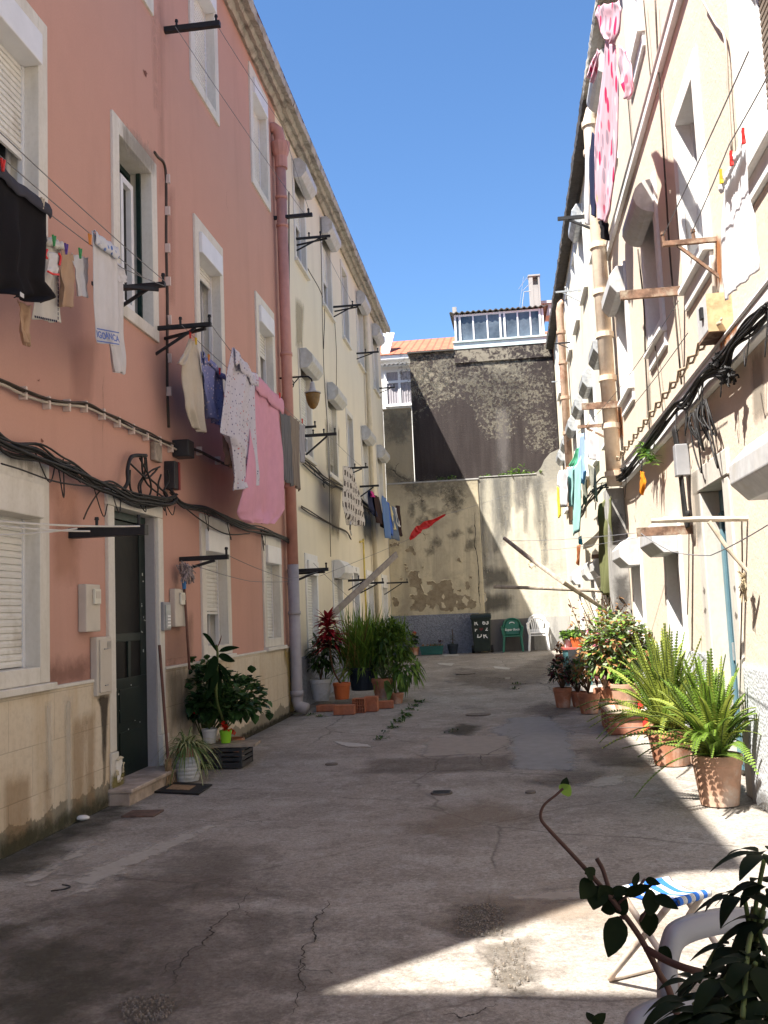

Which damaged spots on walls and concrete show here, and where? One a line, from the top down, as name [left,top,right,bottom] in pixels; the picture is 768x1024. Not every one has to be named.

peeling [390,542,487,613]
water stain [0,696,124,858]
crack [161,883,263,988]
crack [291,902,333,1014]